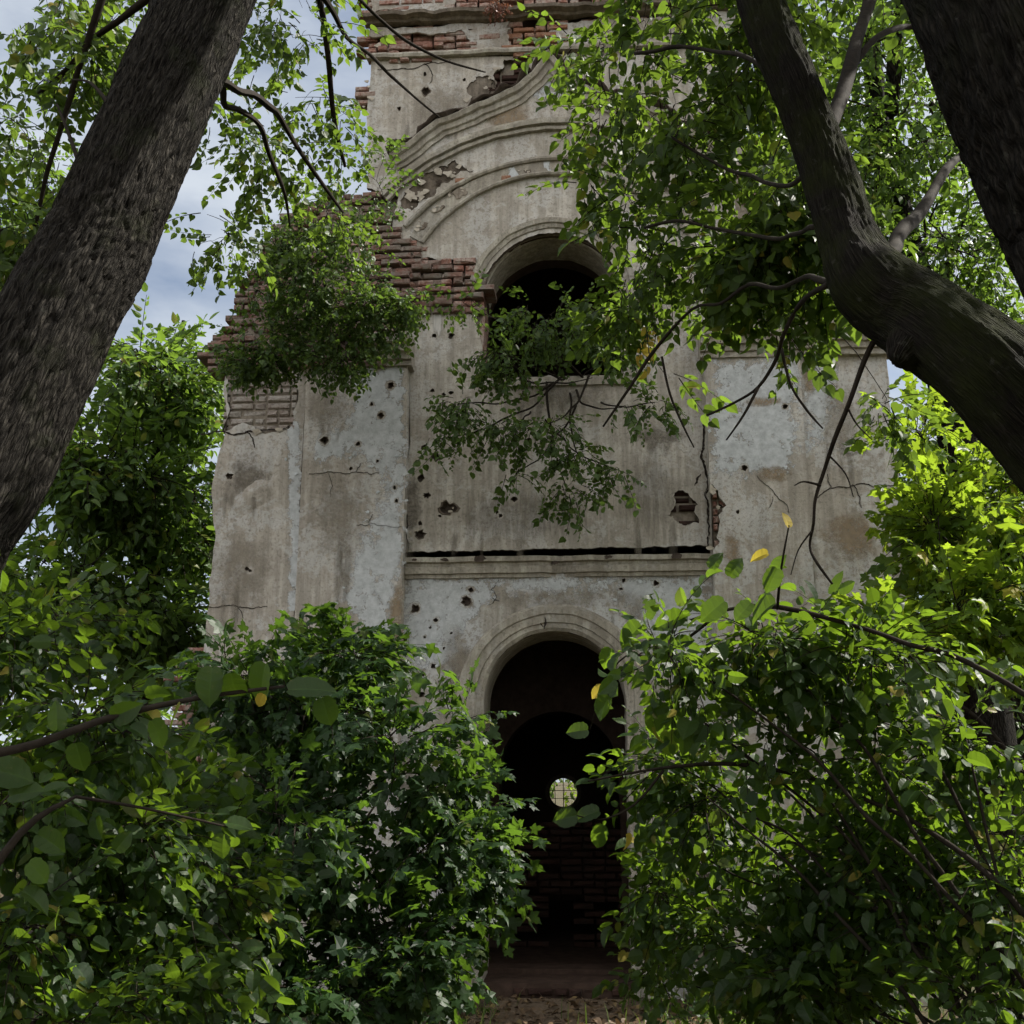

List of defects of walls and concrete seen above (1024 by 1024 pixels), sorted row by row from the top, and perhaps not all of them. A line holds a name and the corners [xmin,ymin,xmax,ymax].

flaking render [358,24,568,103]
flaking render [348,161,480,314]
crack [314,463,378,497]
peeling [223,366,712,669]
crack [694,424,710,546]
peeling [706,357,841,550]